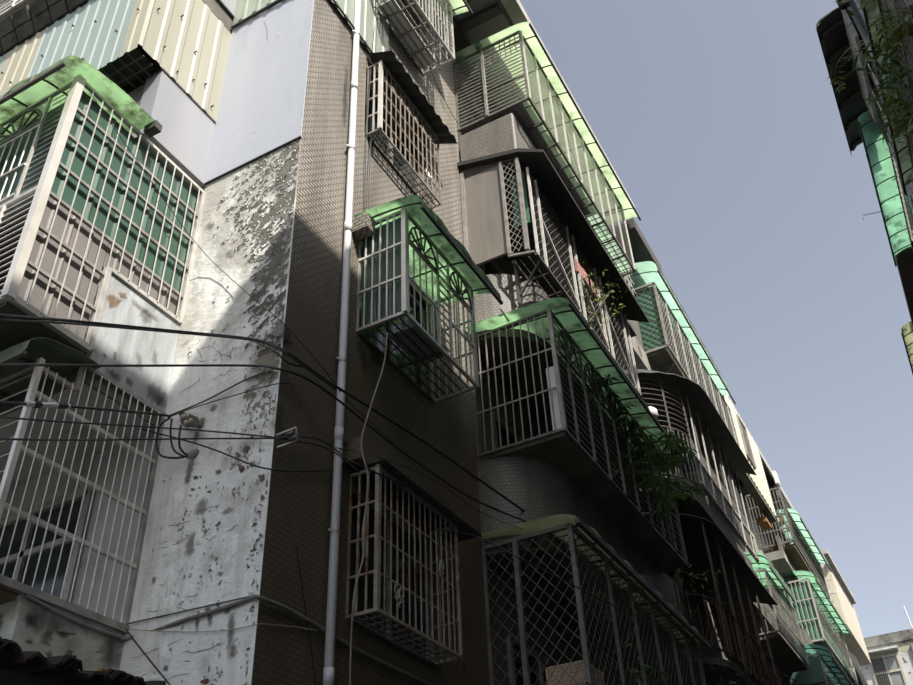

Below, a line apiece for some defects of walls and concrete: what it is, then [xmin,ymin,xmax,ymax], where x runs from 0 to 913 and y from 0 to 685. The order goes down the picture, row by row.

peeling [156,547,226,606]
peeling [168,139,300,625]